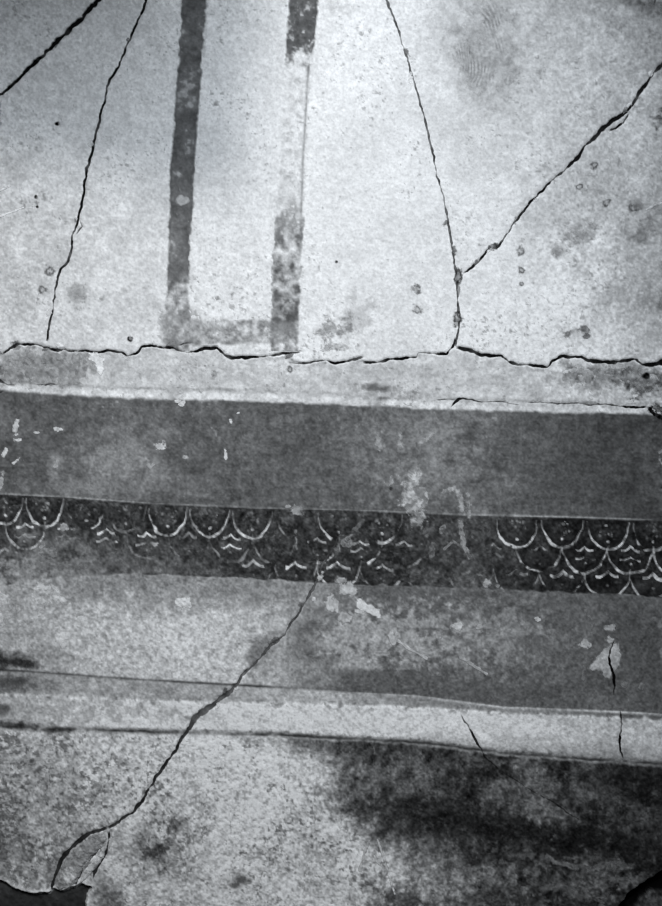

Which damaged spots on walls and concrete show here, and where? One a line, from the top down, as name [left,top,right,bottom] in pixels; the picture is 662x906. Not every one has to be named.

crack [0,0,662,368]
crack [439,397,500,406]
crack [551,401,645,409]
crack [608,626,616,692]
crack [51,549,333,889]
crack [616,713,624,756]
spalling [0,834,107,906]
crack [619,871,662,906]